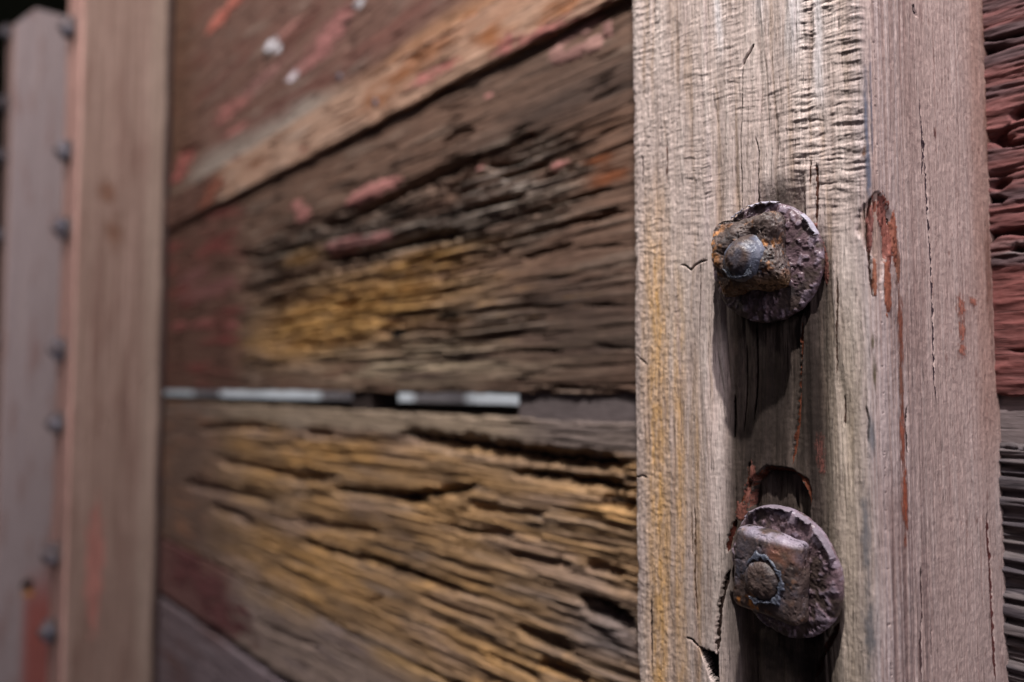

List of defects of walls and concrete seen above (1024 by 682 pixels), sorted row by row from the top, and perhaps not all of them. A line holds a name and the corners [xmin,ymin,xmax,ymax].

crack [919,100,938,405]
crack [687,323,812,653]